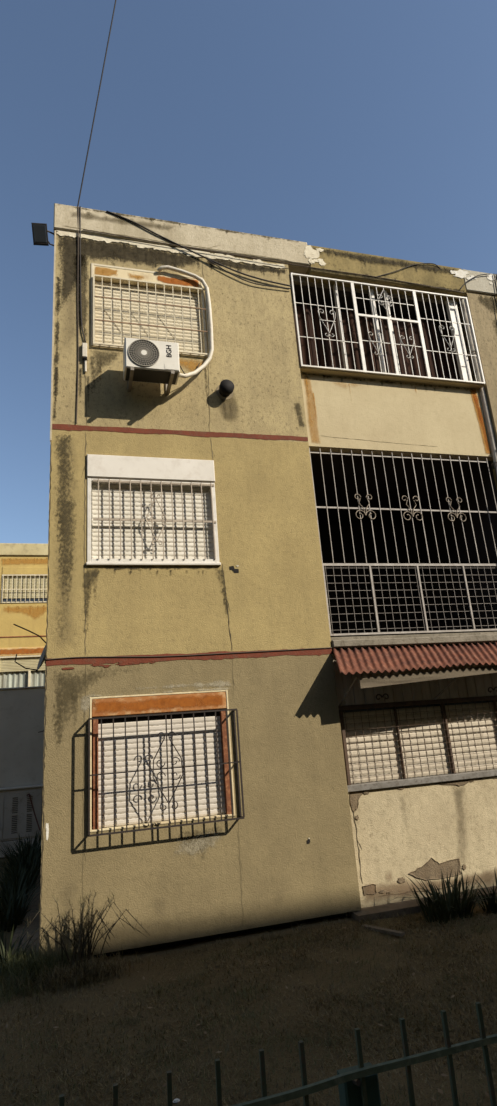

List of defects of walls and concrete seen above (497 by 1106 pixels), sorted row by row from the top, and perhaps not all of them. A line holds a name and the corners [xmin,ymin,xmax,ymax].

peeling [304,245,326,266]
water stain [53,236,285,418]
water stain [479,296,497,328]
water stain [57,436,74,594]
water stain [57,672,95,728]
spalling [362,858,466,896]